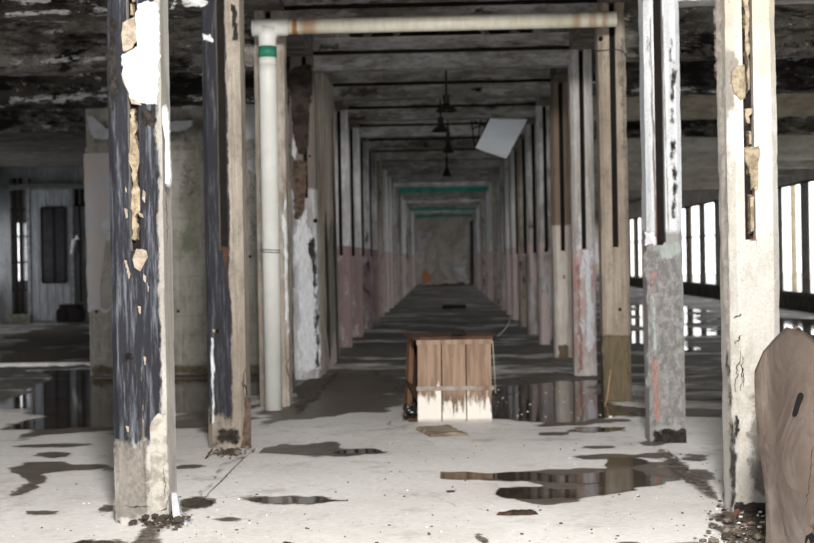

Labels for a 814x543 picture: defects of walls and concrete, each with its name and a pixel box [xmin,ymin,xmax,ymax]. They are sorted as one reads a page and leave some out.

flaking render [121,0,193,188]
water stain [170,116,204,141]
peeling [124,249,149,292]
crack [733,314,744,392]